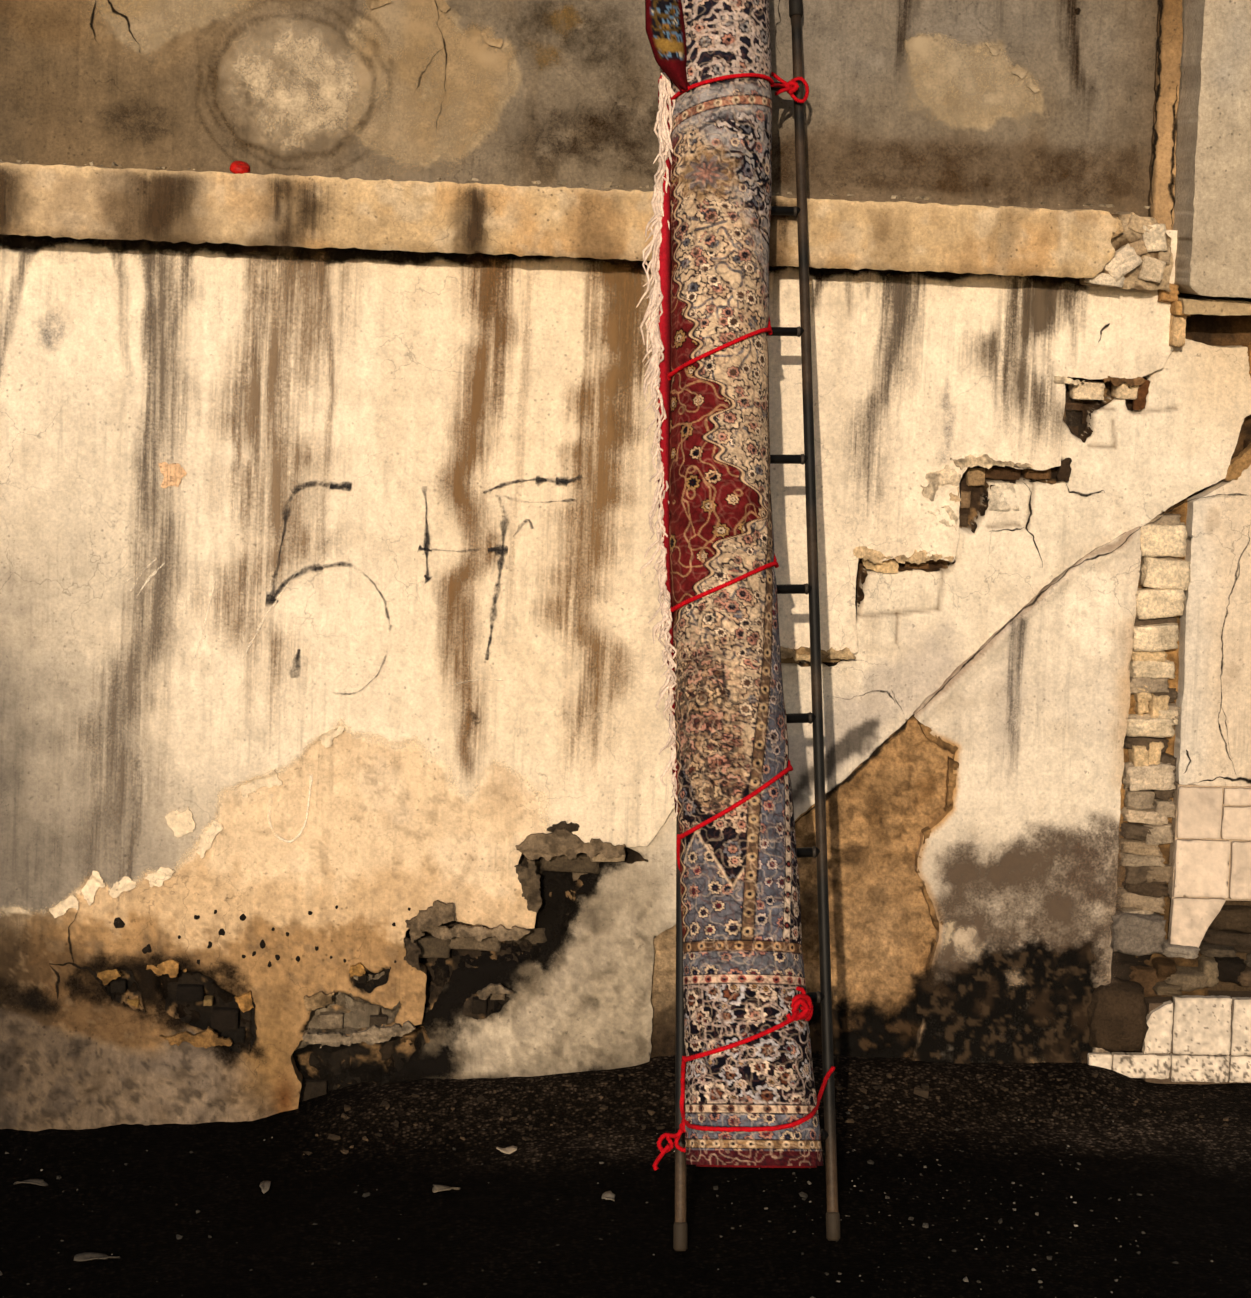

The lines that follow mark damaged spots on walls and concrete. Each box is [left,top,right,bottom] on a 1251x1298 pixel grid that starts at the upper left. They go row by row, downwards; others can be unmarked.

crack [90,0,140,52]
crack [414,1,447,129]
leakage [1066,0,1085,87]
leakage [539,100,657,170]
flaking render [1185,297,1251,376]
flaking render [1048,376,1150,443]
leakage [0,168,655,878]
flaking render [920,454,1072,533]
crack [795,482,1251,823]
flaking render [514,795,648,931]
flaking render [795,716,959,1016]
leakage [932,815,1125,988]